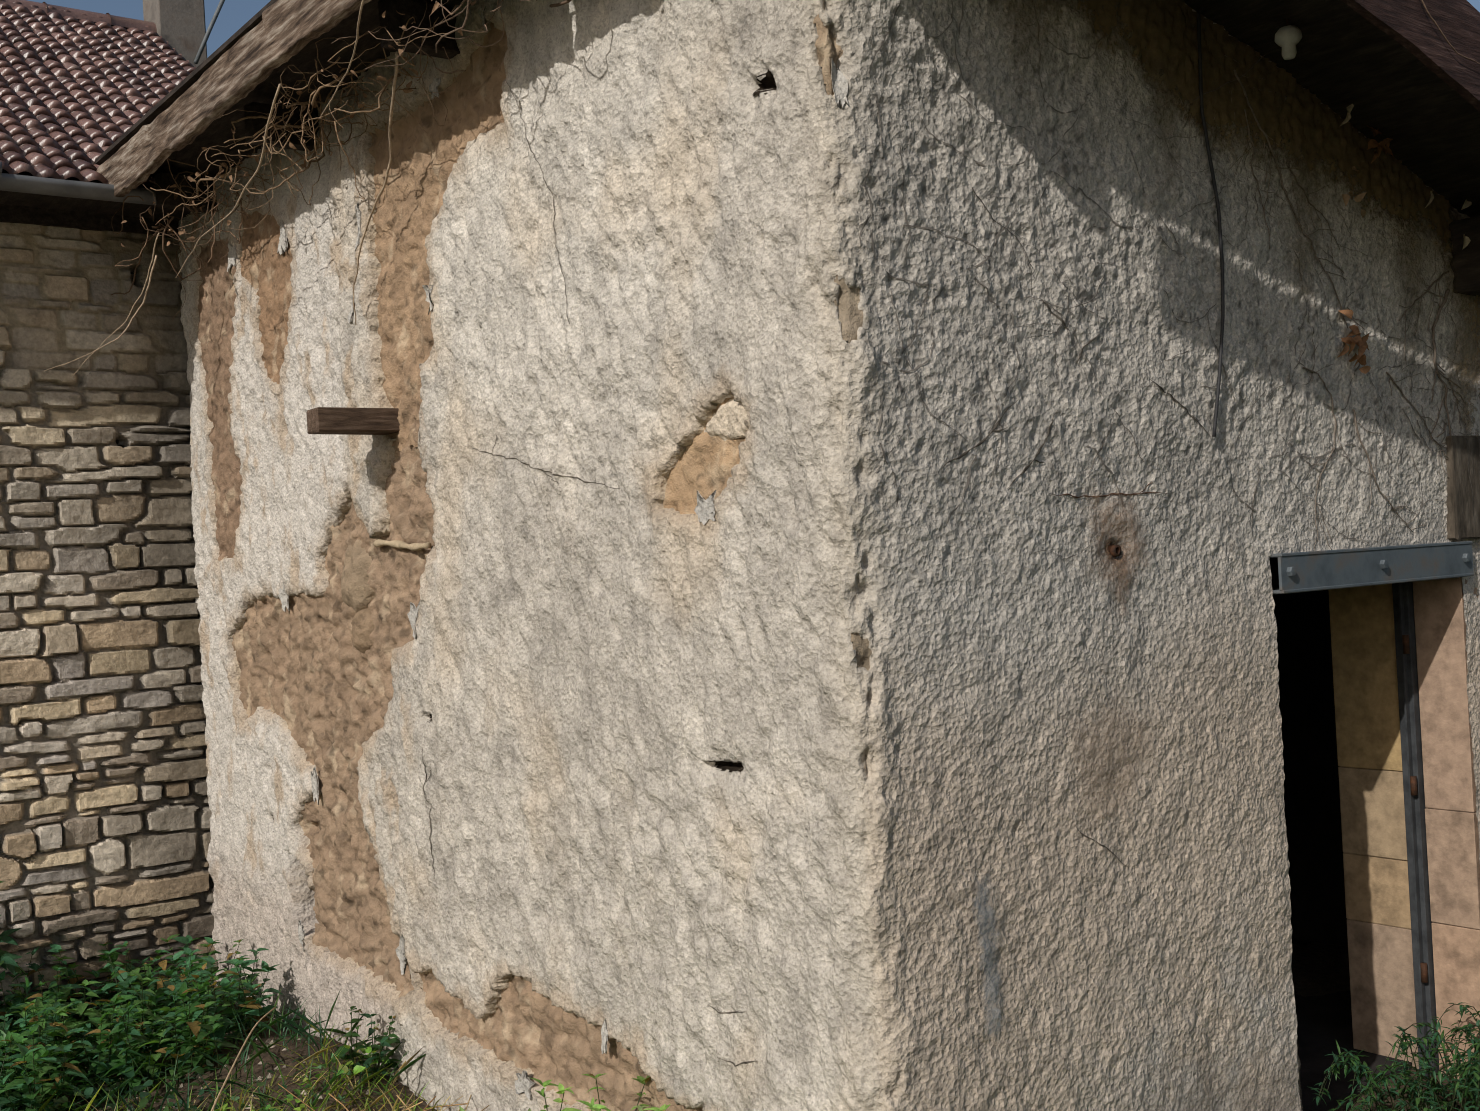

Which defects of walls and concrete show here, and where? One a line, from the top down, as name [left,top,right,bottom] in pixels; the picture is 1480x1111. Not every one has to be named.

spalling [813,14,848,109]
spalling [833,275,863,343]
peeling [196,211,293,562]
spalling [663,397,748,525]
peeling [232,6,703,1111]